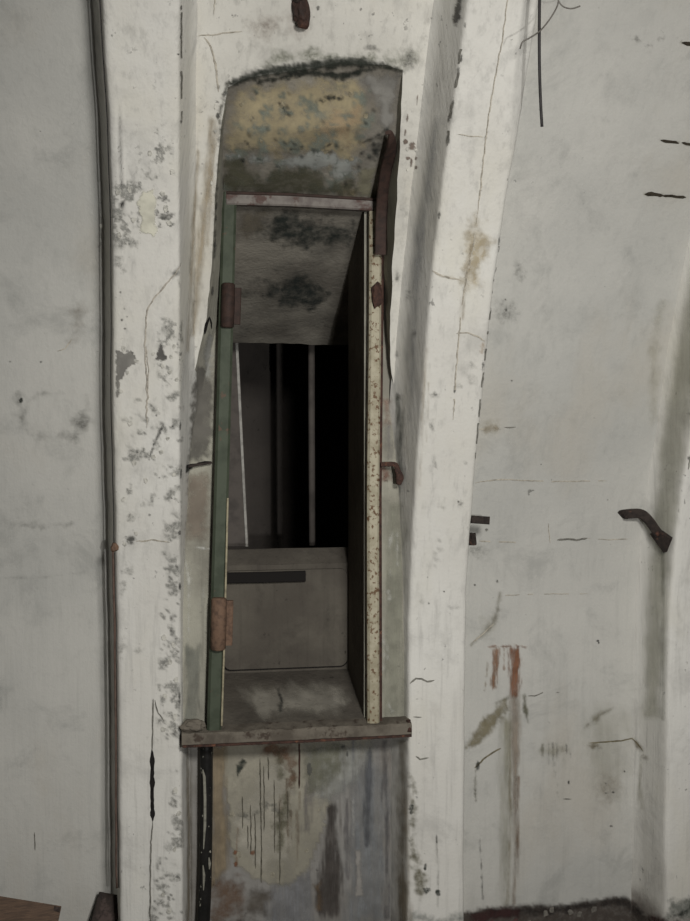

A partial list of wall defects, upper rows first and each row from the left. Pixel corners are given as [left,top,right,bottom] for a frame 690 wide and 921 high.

leakage [230,51,411,158]
mould [224,158,354,195]
corrosion [492,646,520,813]